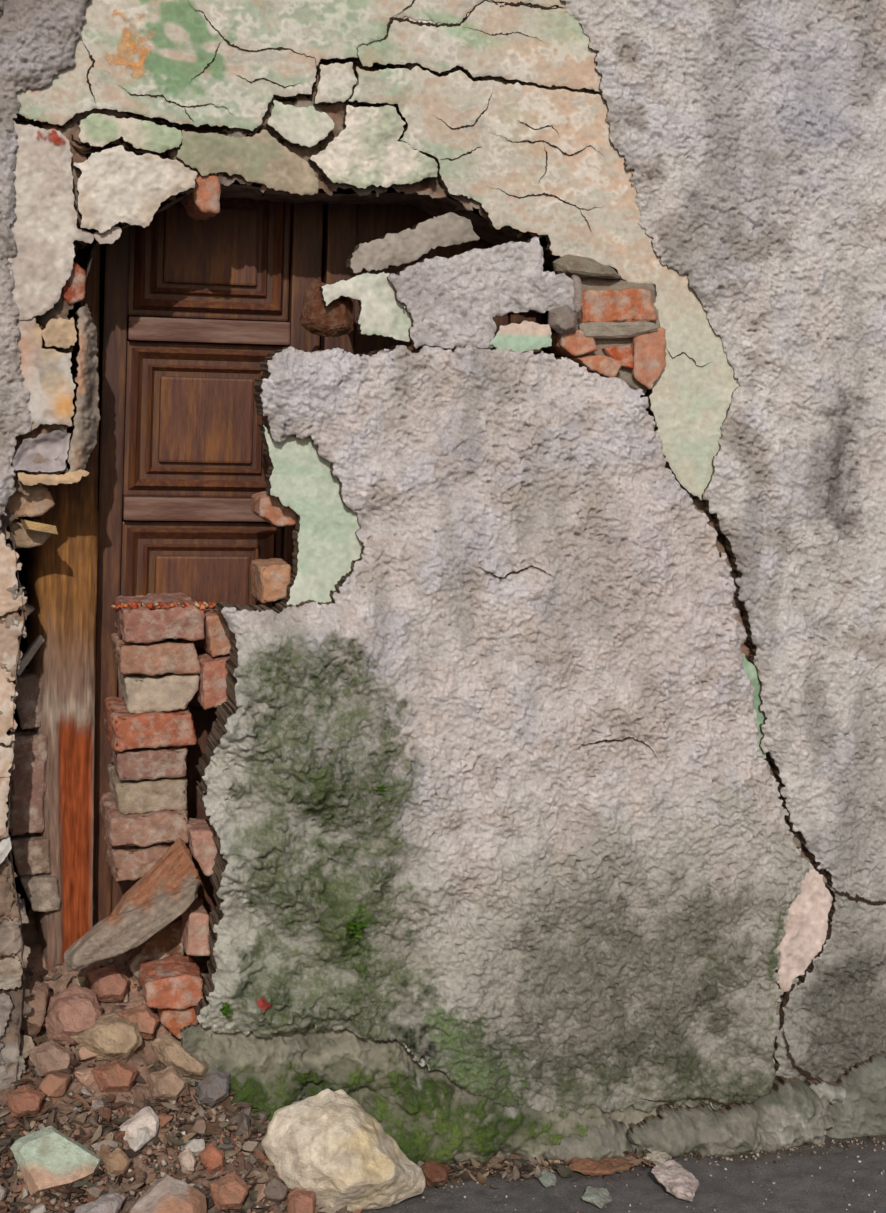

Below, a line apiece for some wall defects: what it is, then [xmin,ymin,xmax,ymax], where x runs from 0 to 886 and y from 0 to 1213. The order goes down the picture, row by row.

crack [16,0,602,231]
peeling [7,0,739,500]
crack [693,496,738,574]
spalling [0,530,27,1065]
water stain [510,887,775,1113]
crack [636,1096,748,1106]
crack [778,996,817,1083]
spalling [775,863,833,992]